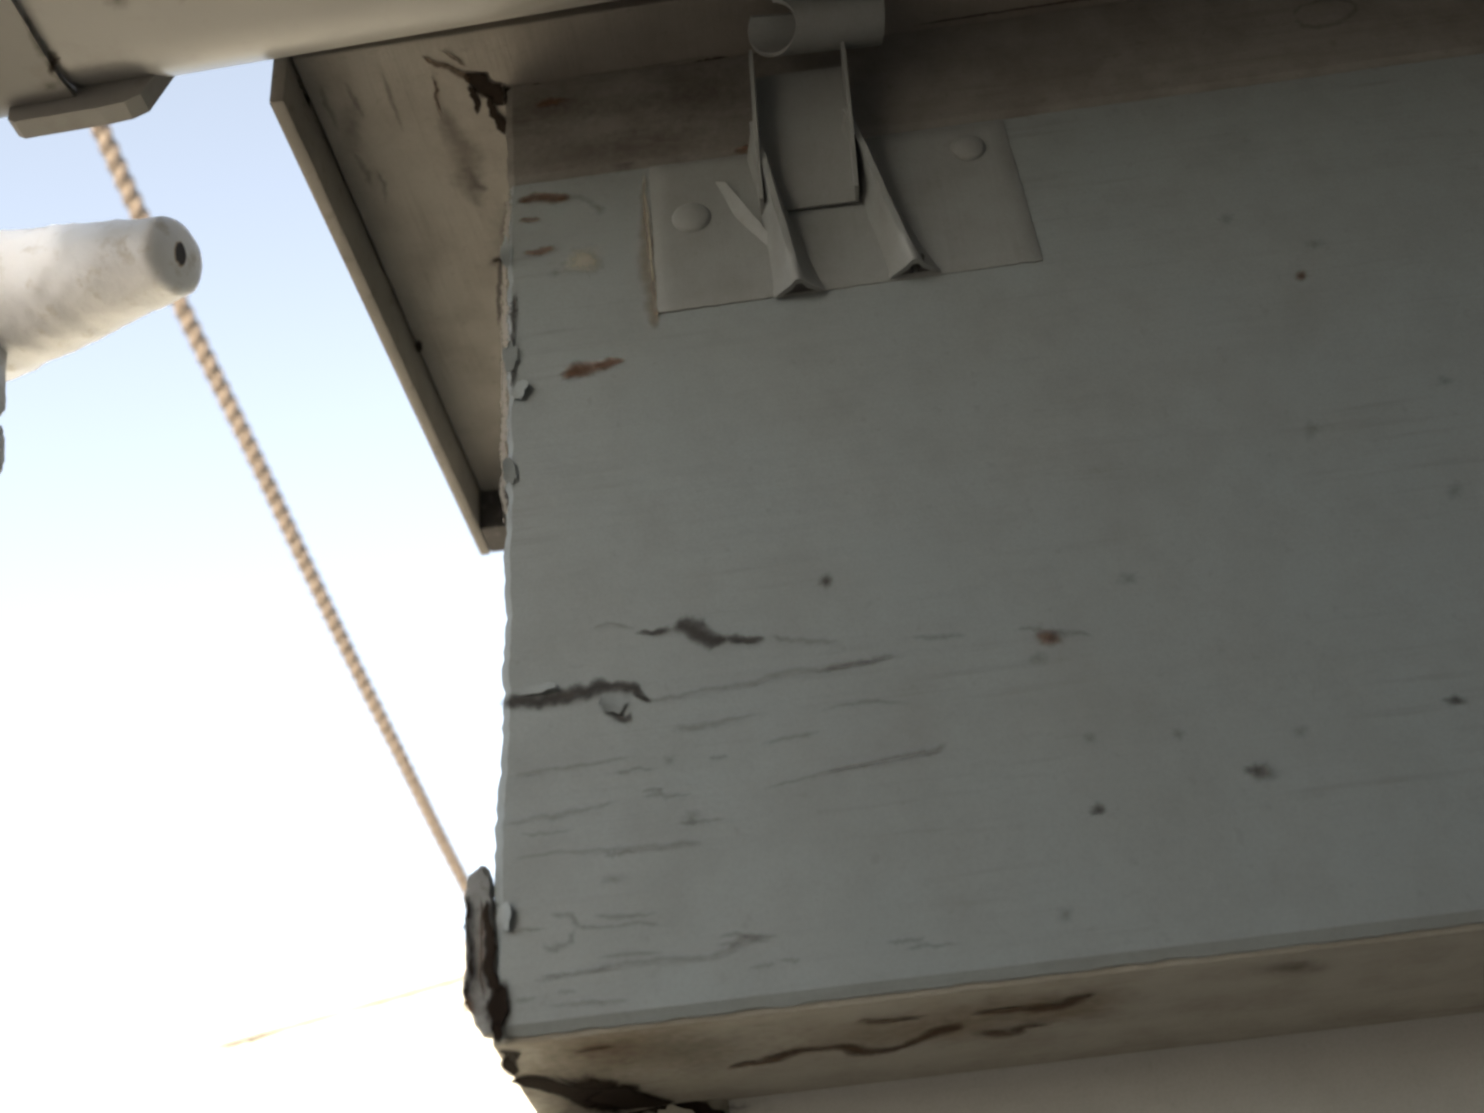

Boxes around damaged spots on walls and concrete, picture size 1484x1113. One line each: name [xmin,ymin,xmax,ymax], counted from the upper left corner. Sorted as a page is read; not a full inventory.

crack [423,51,536,134]
rust [565,359,621,376]
crack [640,618,762,647]
crack [503,680,648,721]
peeling [497,901,511,931]
crack [730,995,1091,1069]
spalling [511,1076,724,1113]